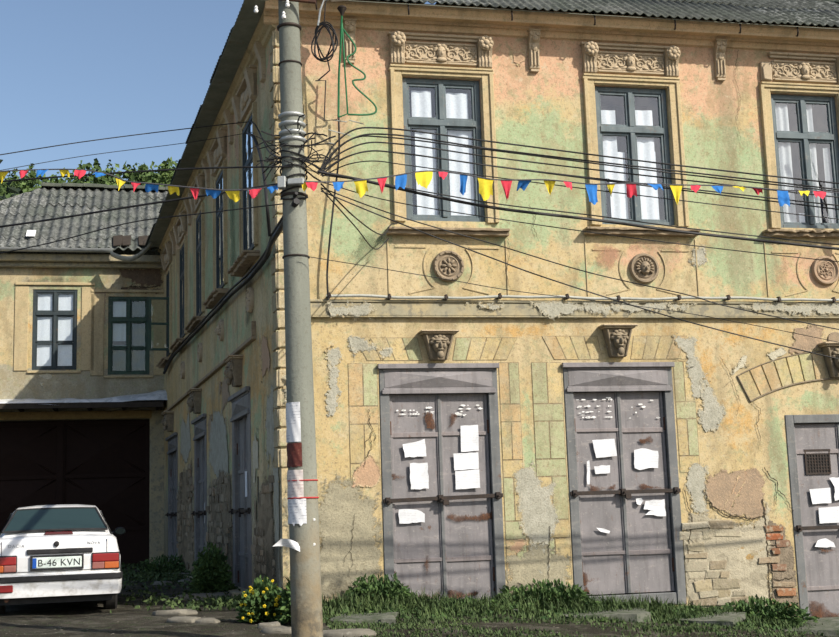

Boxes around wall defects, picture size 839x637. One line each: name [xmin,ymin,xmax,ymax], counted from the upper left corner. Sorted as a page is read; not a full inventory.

flaking render [327,300,377,319]
flaking render [530,299,696,320]
flaking render [207,409,228,478]
flaking render [252,375,290,592]
flaking render [318,454,383,599]
corrosion [424,412,435,429]
corrosion [447,512,493,521]
flaking render [506,462,572,593]
flaking render [672,335,726,433]
crack [684,467,793,598]
crack [721,358,761,448]
flaking render [684,462,799,606]